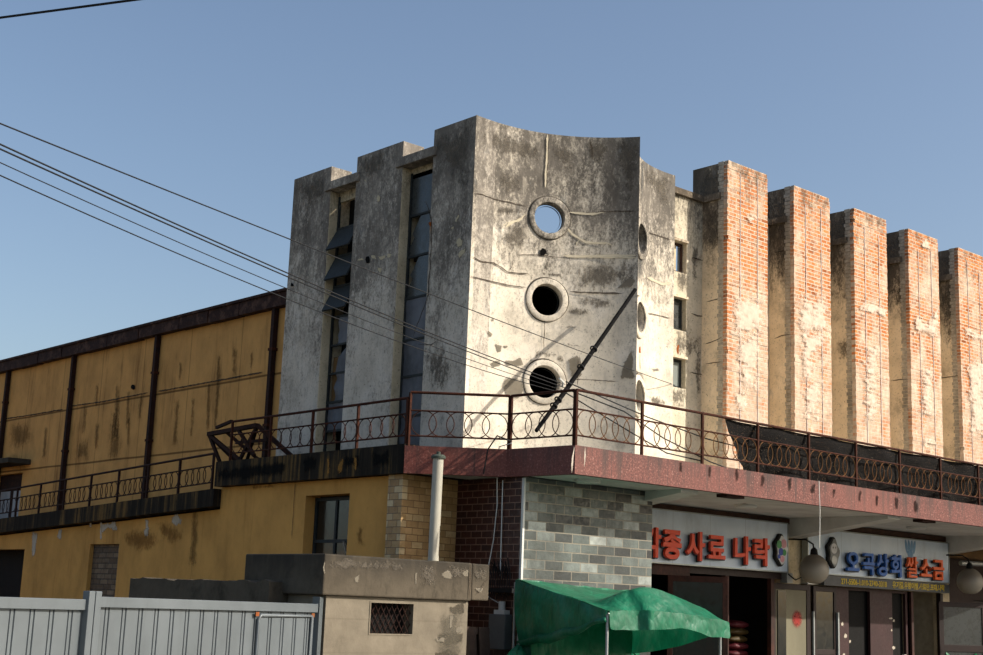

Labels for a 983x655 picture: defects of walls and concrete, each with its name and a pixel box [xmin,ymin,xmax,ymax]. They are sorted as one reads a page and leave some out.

water stain [484,134,538,157]
water stain [502,226,525,246]
water stain [569,259,642,314]
flaking render [861,302,886,316]
flaking render [914,310,939,336]
water stain [427,350,451,388]
flaking render [732,298,763,410]
flaking render [800,293,828,420]
flaking render [864,346,880,420]
flaking render [922,368,933,415]
flaking render [969,361,983,438]
water stain [218,462,285,480]